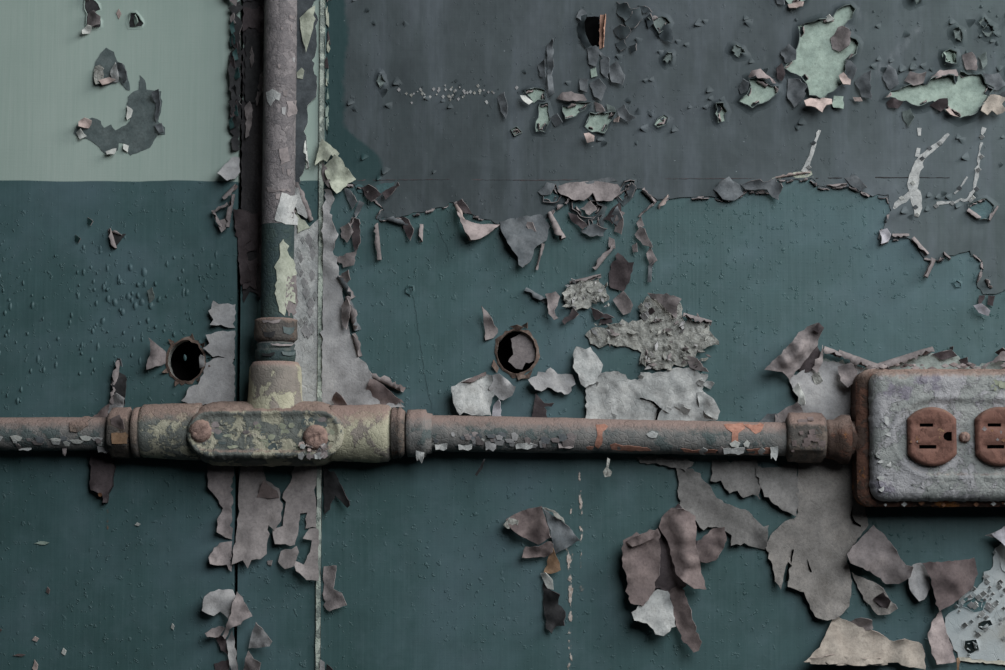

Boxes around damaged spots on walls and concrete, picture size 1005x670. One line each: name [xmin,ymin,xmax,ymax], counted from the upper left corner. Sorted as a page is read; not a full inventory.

peeling [82,0,104,34]
peeling [74,48,165,155]
peeling [116,9,145,29]
peeling [710,0,1005,130]
flaking render [181,0,720,438]
peeling [691,170,951,278]
peeling [933,186,1000,224]
peeling [973,254,995,316]
peeling [197,417,350,612]
peeling [503,506,580,634]
peeling [202,589,272,670]